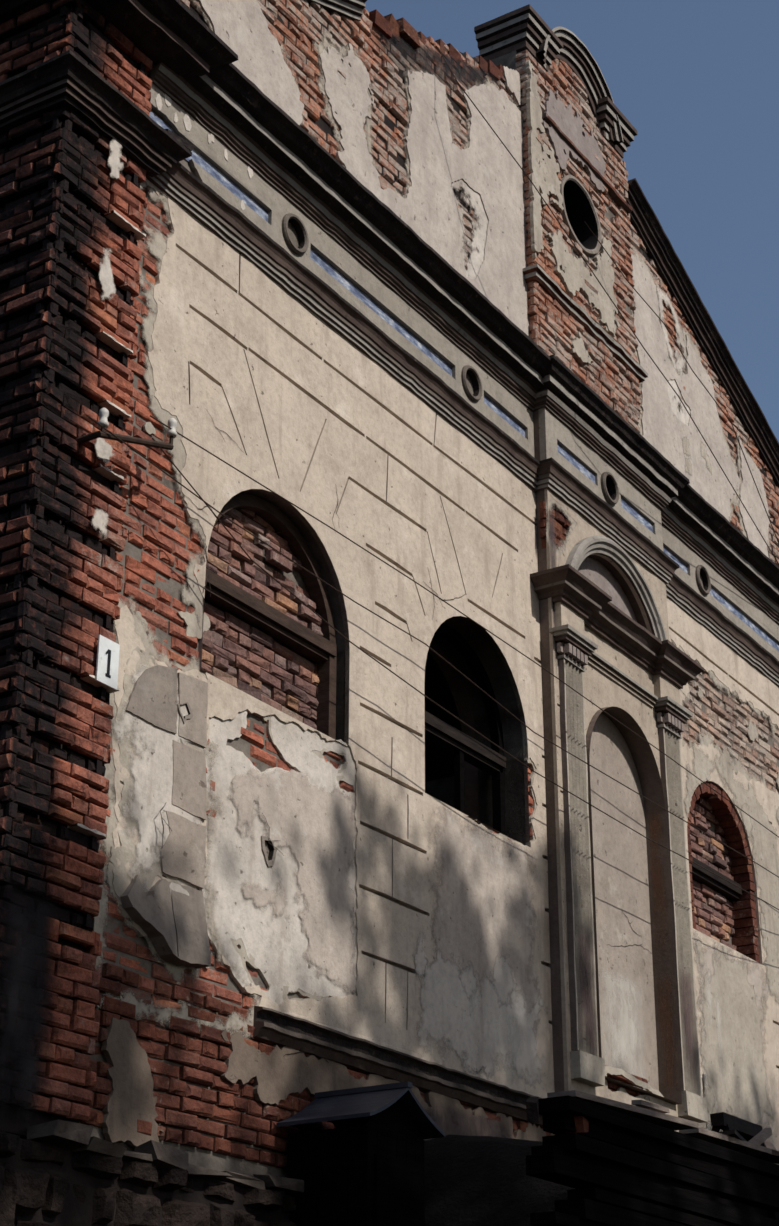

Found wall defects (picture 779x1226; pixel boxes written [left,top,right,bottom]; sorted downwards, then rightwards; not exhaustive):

flaking render [155,94,228,161]
spalling [180,0,213,31]
spalling [257,0,514,198]
flaking render [451,179,488,279]
spalling [113,182,210,679]
spalling [629,225,779,567]
flaking render [86,692,357,1037]